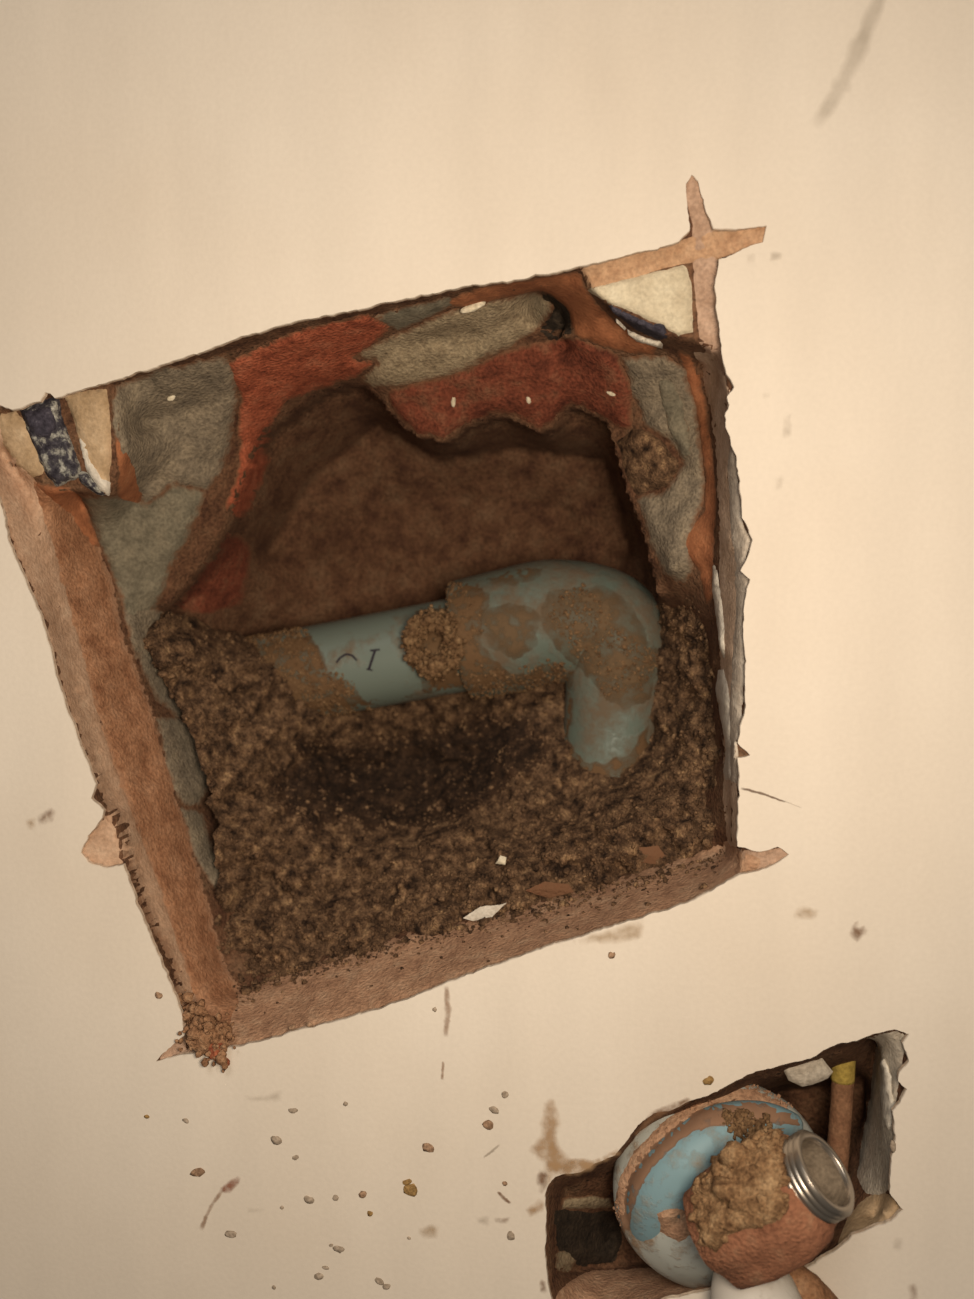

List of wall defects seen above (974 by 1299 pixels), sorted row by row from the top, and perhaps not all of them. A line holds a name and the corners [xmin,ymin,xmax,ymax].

spalling [33,372,150,496]
spalling [8,526,88,755]
spalling [101,552,180,757]
spalling [157,263,751,853]
spalling [83,769,192,1007]
spalling [191,852,276,991]
spalling [621,846,673,880]
spalling [545,1029,907,1299]